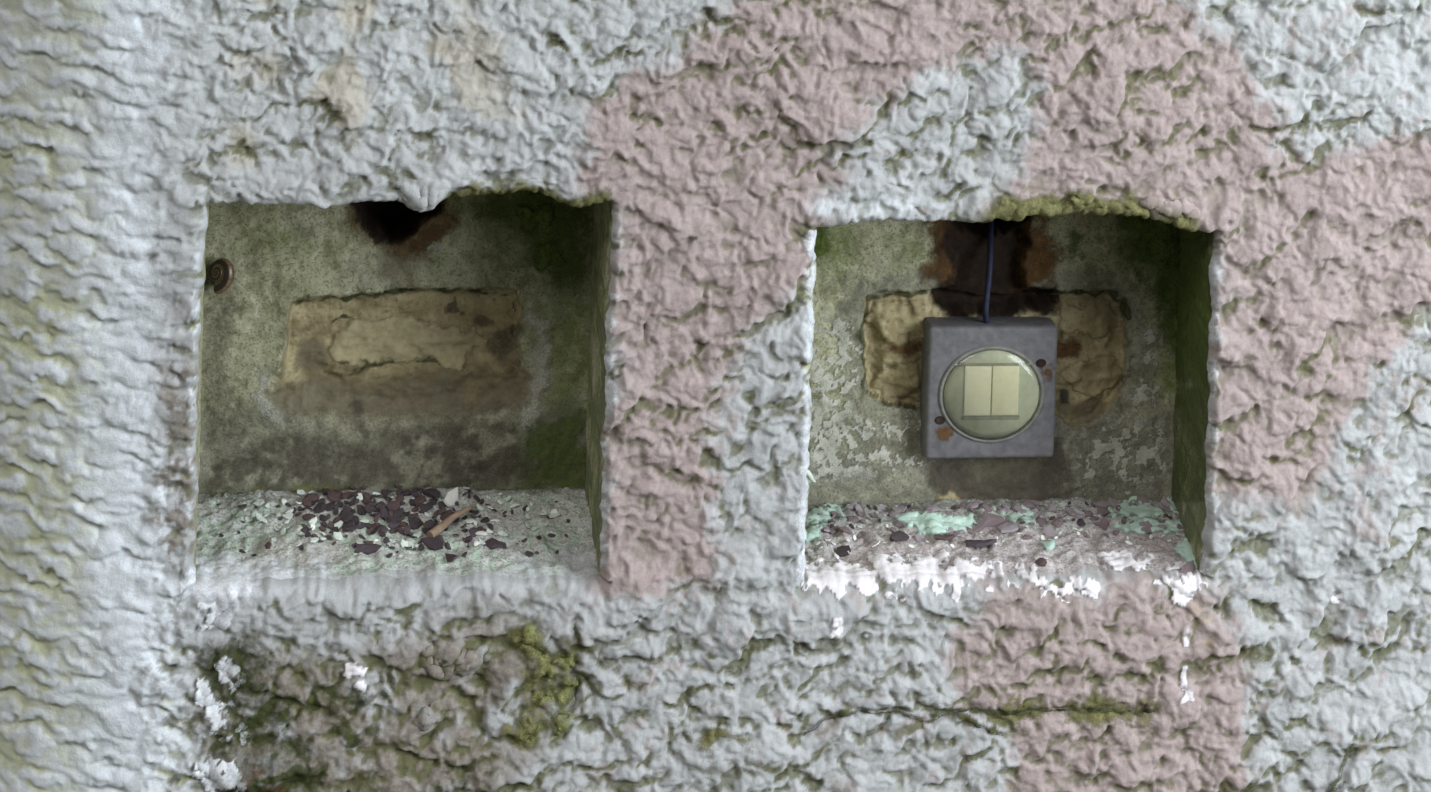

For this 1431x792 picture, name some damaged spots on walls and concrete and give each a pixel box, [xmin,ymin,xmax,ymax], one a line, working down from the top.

rust [921,215,1064,317]
flaking render [255,288,552,432]
flaking render [800,291,1209,607]